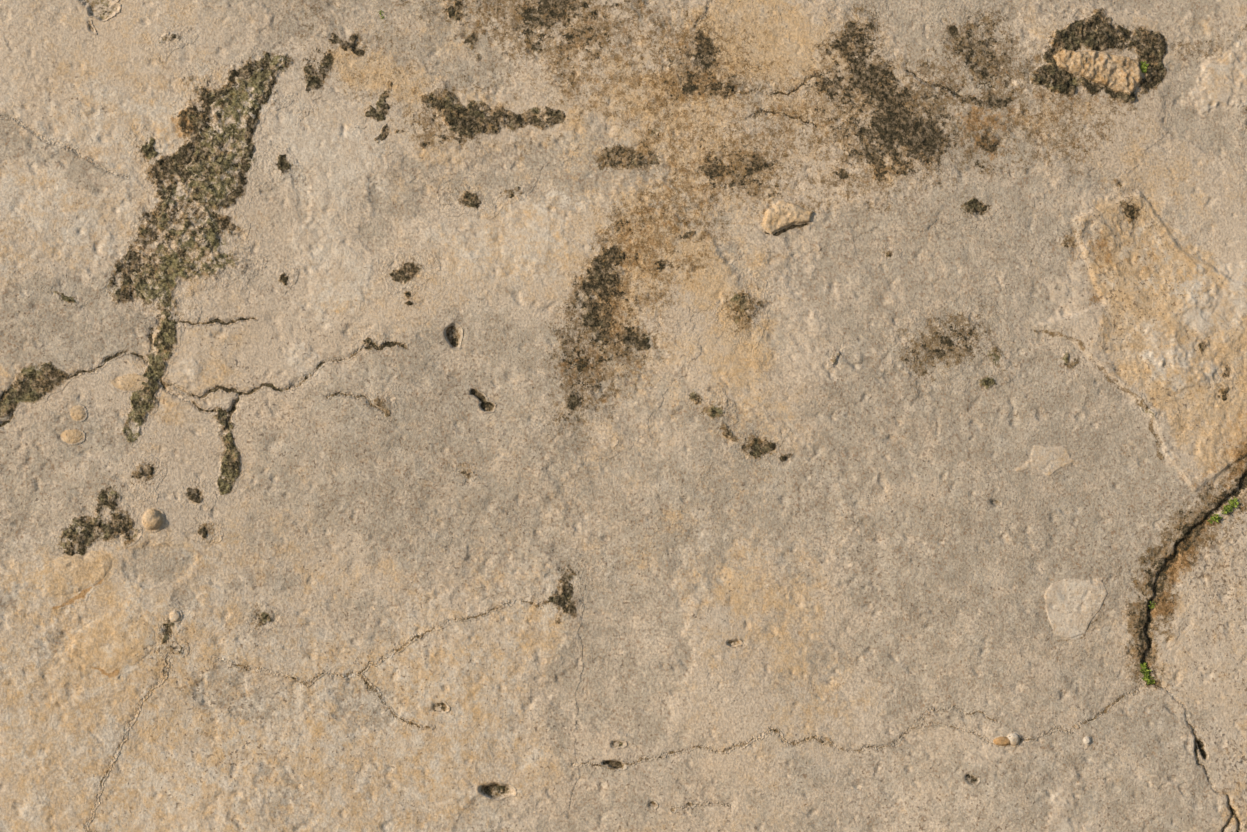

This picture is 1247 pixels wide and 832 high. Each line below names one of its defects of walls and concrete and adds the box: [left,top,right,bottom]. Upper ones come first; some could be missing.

crack [691,0,715,32]
crack [724,73,821,128]
crack [906,70,961,98]
crack [66,317,408,422]
crack [0,383,17,428]
water stain [255,0,1172,816]
crack [568,472,1247,832]